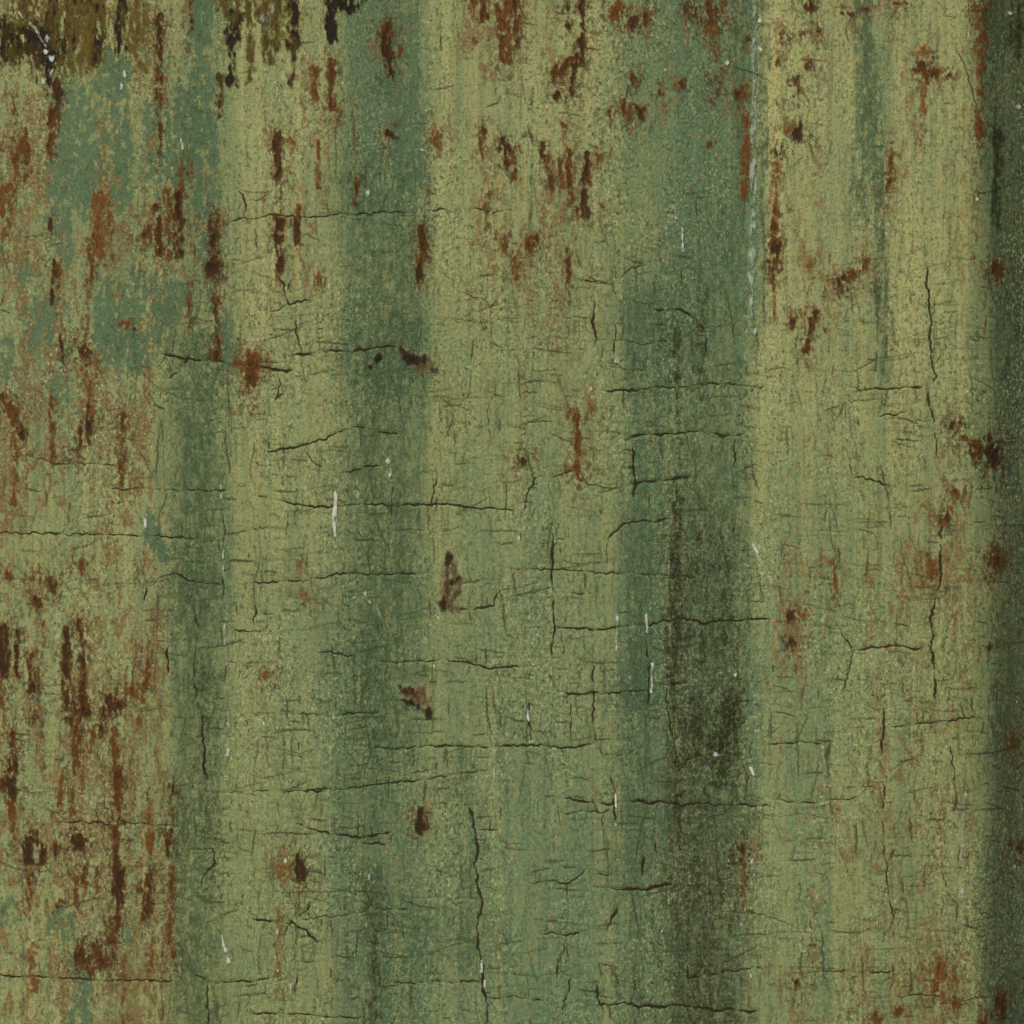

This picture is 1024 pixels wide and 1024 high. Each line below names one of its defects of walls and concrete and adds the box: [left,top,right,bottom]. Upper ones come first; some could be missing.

rust [140,162,192,261]
rust [204,205,224,362]
crack [162,277,394,399]
rust [496,131,517,180]
rust [539,141,604,218]
rust [767,119,803,318]
crack [839,268,940,456]
crack [231,426,855,820]
crack [841,514,975,754]
rust [0,618,178,1007]
crack [253,893,407,1022]
crack [376,808,580,1023]